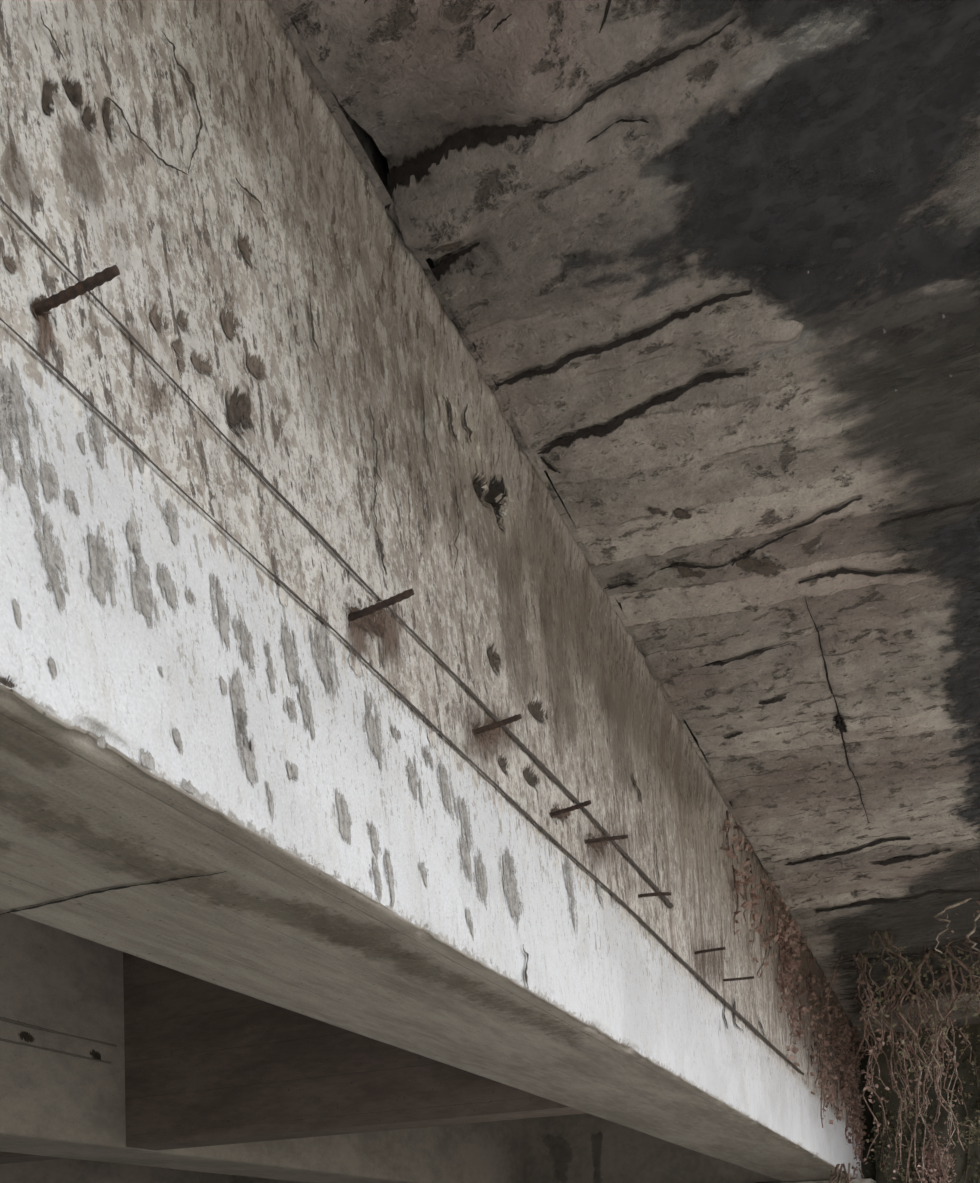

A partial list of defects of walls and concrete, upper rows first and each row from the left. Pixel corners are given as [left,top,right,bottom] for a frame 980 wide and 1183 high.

crack [108,31,203,175]
crack [384,15,741,210]
rust [32,302,55,356]
crack [494,290,753,386]
crack [537,373,745,474]
spalling [472,476,507,530]
crack [604,497,862,589]
water stain [564,0,980,1014]
rust [467,711,512,763]
crack [785,567,950,866]
crack [0,871,226,915]
crack [816,890,980,913]